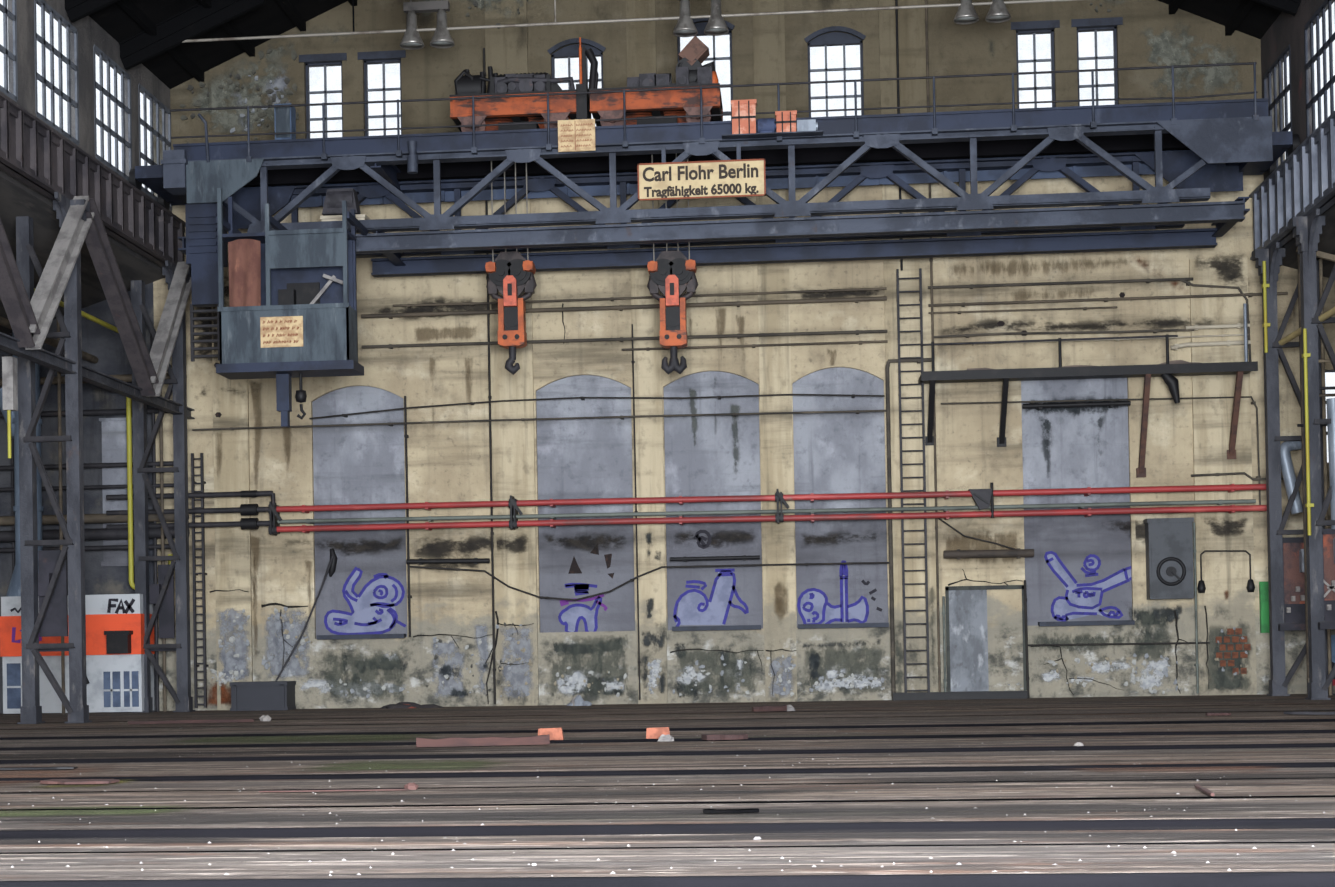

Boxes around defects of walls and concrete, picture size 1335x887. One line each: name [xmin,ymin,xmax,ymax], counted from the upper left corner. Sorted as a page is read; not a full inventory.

peeling [210,607,409,698]
damp [327,655,407,697]
peeling [426,622,535,700]
damp [553,638,626,696]
peeling [647,659,662,694]
damp [642,599,753,697]
peeling [673,654,750,696]
peeling [766,655,885,697]
damp [803,640,882,691]
peeling [1042,653,1178,694]